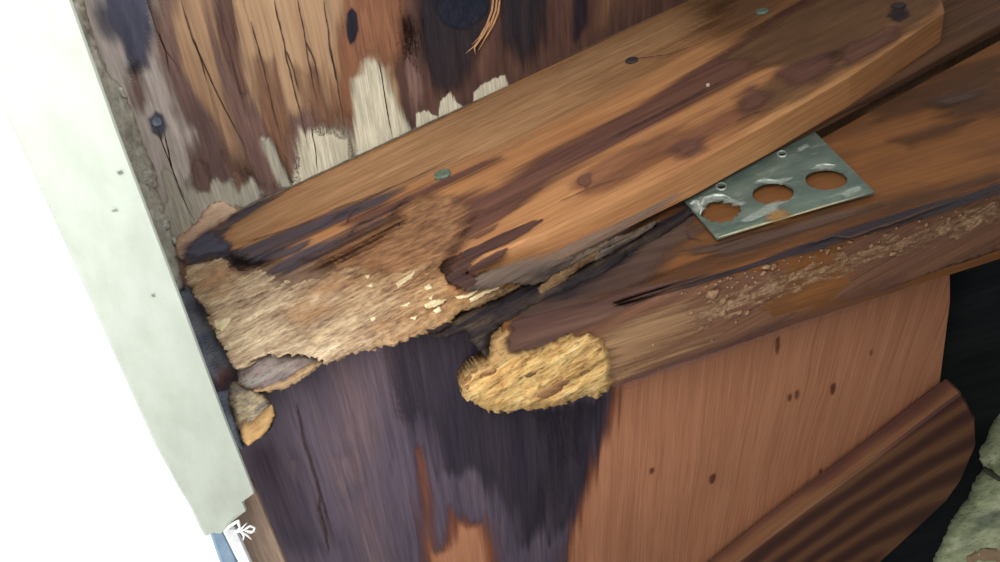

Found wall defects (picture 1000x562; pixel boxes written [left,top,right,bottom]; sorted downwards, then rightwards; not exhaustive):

crack [147,0,250,164]
crack [251,0,349,170]
peeling [262,59,462,188]
crack [379,64,393,139]
peeling [473,75,508,101]
damp [84,0,942,286]
peeling [396,270,416,288]
peeling [214,318,232,331]
spalling [426,322,452,334]
damp [213,369,238,393]
damp [239,303,822,562]